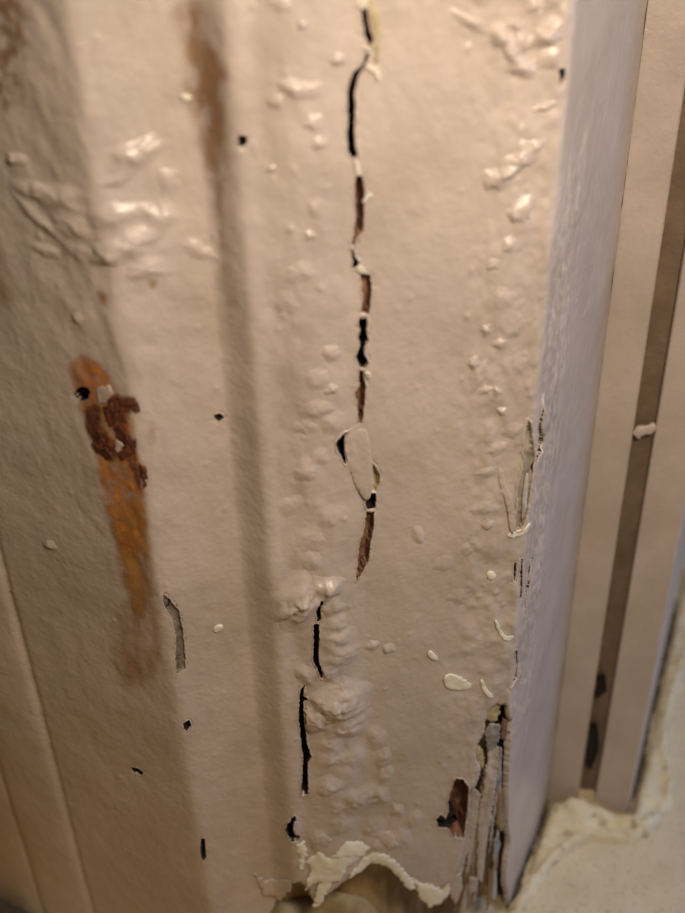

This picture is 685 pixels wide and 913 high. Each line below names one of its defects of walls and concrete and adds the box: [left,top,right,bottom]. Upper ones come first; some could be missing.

crack [334,0,383,584]
rust [72,358,150,614]
crack [530,393,546,473]
crack [297,601,326,797]
crack [480,556,534,699]
peeling [254,873,293,901]
peeling [293,821,463,908]
spalling [437,801,457,827]